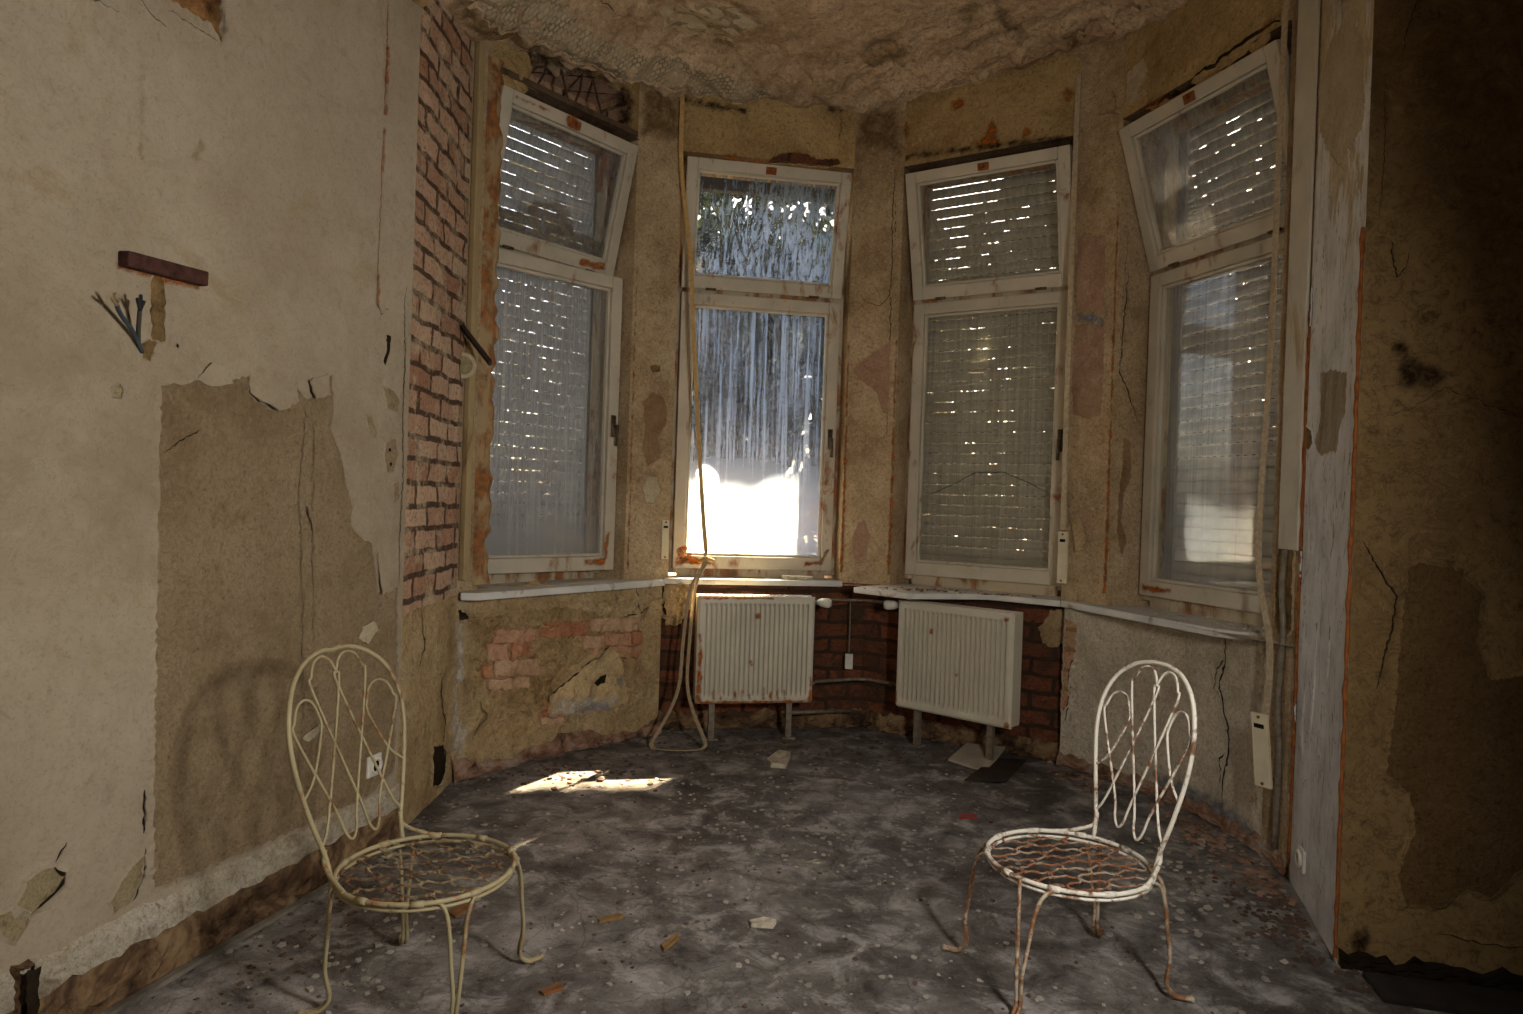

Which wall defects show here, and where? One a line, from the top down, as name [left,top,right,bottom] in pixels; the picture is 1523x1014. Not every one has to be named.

spalling [159,0,227,49]
peeling [655,0,763,44]
spalling [1074,0,1188,51]
spalling [493,41,627,125]
spalling [382,333,391,367]
crack [1297,517,1305,591]
peeling [107,363,400,915]
flaking render [456,581,643,736]
crack [1211,638,1230,803]
crack [1268,626,1331,827]
spalling [0,906,42,1014]